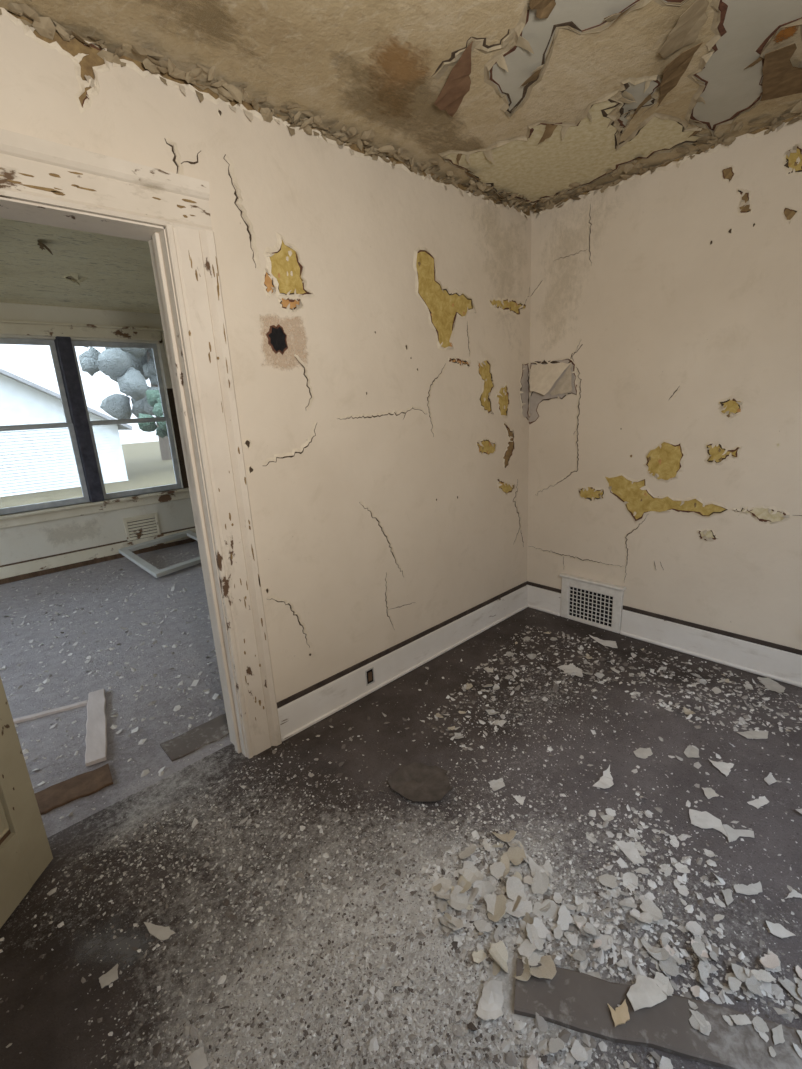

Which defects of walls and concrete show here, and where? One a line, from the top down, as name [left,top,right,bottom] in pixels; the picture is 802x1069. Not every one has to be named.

peeling [260,232,315,313]
spalling [266,324,288,355]
crack [262,321,471,466]
peeling [413,246,578,496]
peeling [577,439,792,542]
crack [359,501,412,629]
crack [267,595,312,648]